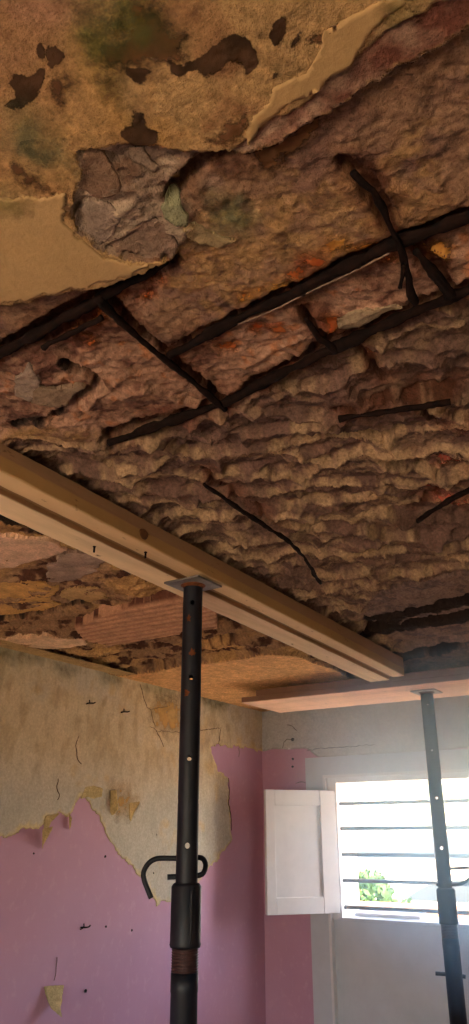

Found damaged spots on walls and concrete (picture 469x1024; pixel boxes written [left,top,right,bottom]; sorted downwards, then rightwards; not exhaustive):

peeling [100,0,259,84]
peeling [269,16,330,48]
corrosion [239,238,383,302]
spalling [0,27,469,679]
peeling [0,515,469,906]